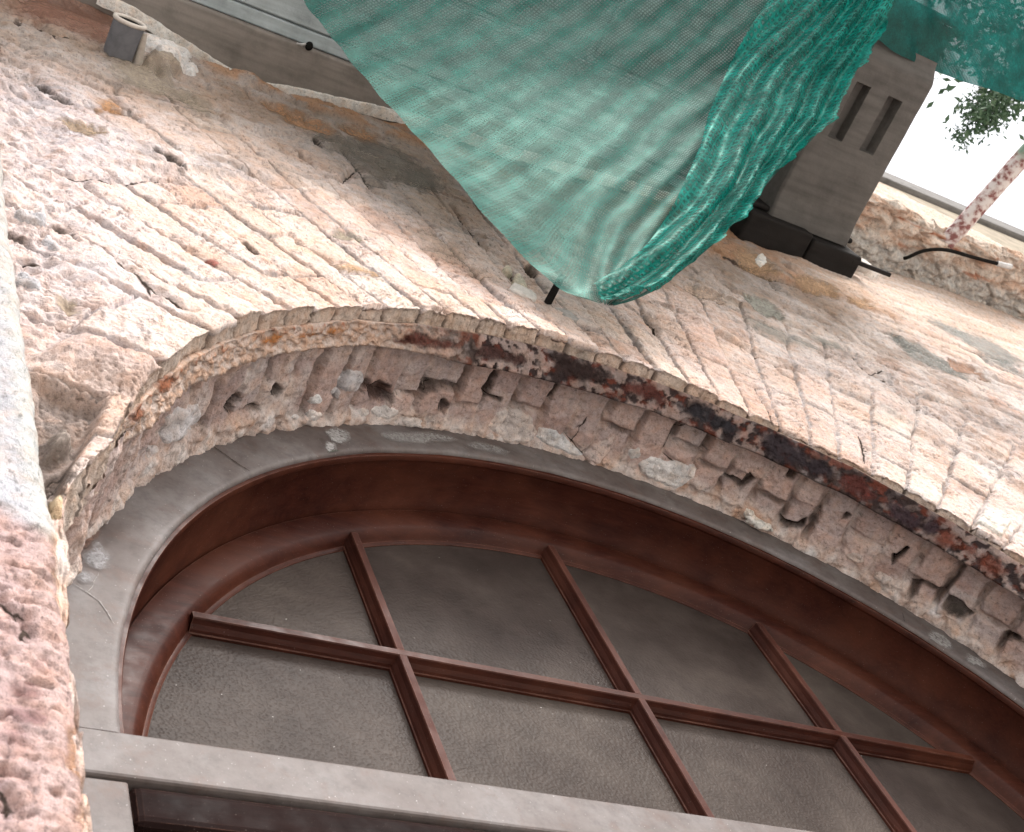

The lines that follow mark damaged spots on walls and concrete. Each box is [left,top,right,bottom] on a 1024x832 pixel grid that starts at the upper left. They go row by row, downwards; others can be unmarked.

crack [343,163,370,189]
corrosion [395,331,452,349]
corrosion [476,345,527,365]
corrosion [547,353,610,382]
corrosion [622,383,666,406]
corrosion [688,403,740,436]
corrosion [760,433,832,478]
corrosion [888,502,1002,576]